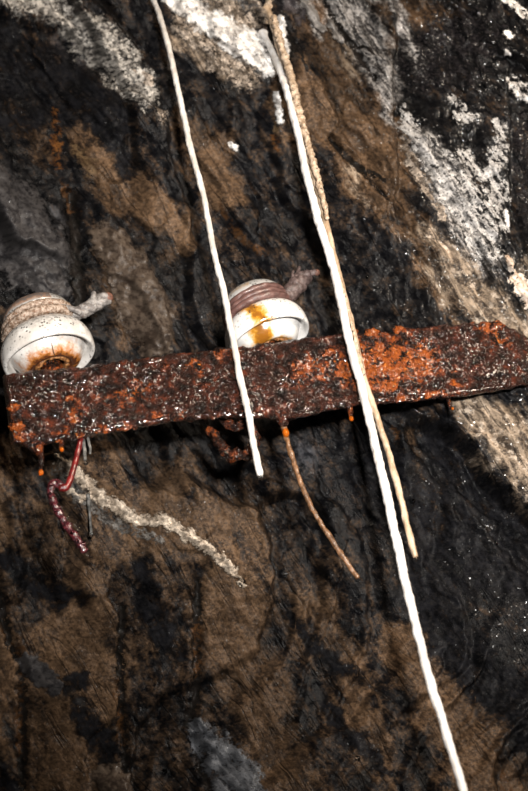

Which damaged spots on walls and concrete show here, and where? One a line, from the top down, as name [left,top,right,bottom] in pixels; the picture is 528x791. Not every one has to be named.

damp [165,0,306,94]
damp [0,0,167,187]
damp [273,91,285,124]
damp [395,0,528,261]
corrosion [356,327,380,336]
corrosion [489,321,505,331]
corrosion [365,368,378,379]
corrosion [375,380,528,409]
corrosion [6,403,26,433]
corrosion [133,410,264,430]
corrosion [276,399,362,427]
corrosion [23,434,66,470]